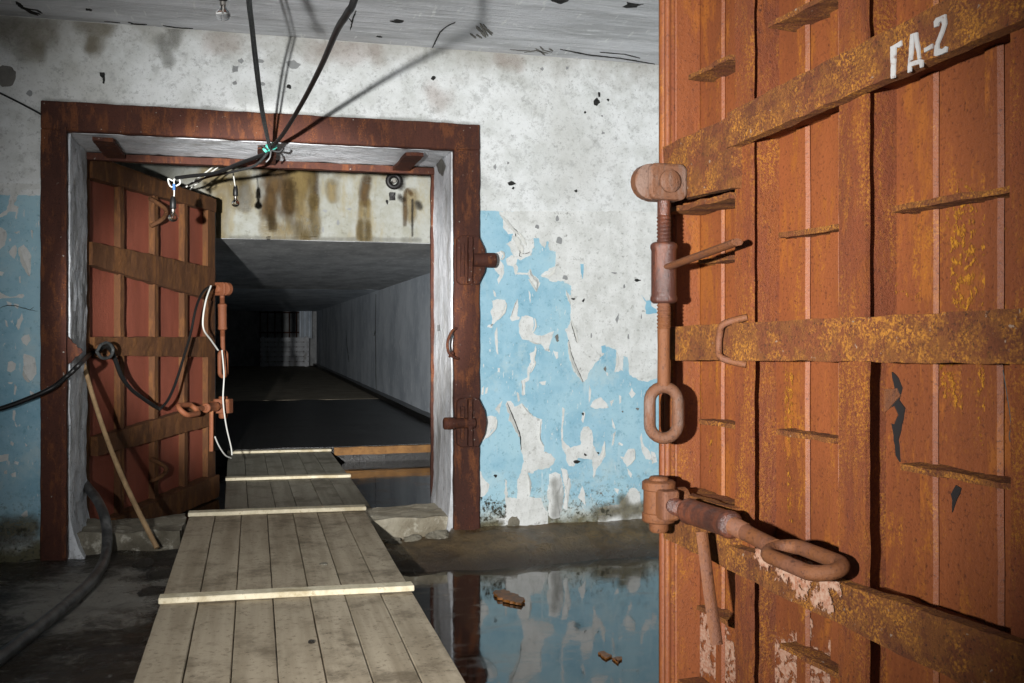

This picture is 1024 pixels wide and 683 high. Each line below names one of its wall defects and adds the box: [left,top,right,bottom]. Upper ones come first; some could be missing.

water stain [202,168,250,238]
rust [256,159,324,239]
water stain [327,172,353,201]
rust [357,176,371,241]
rust [403,189,415,236]
rust [945,181,985,312]
peeling [0,183,41,395]
peeling [479,210,658,526]
mould [480,497,506,527]
water stain [594,496,643,520]
peeling [753,549,842,655]
peeling [775,632,797,683]